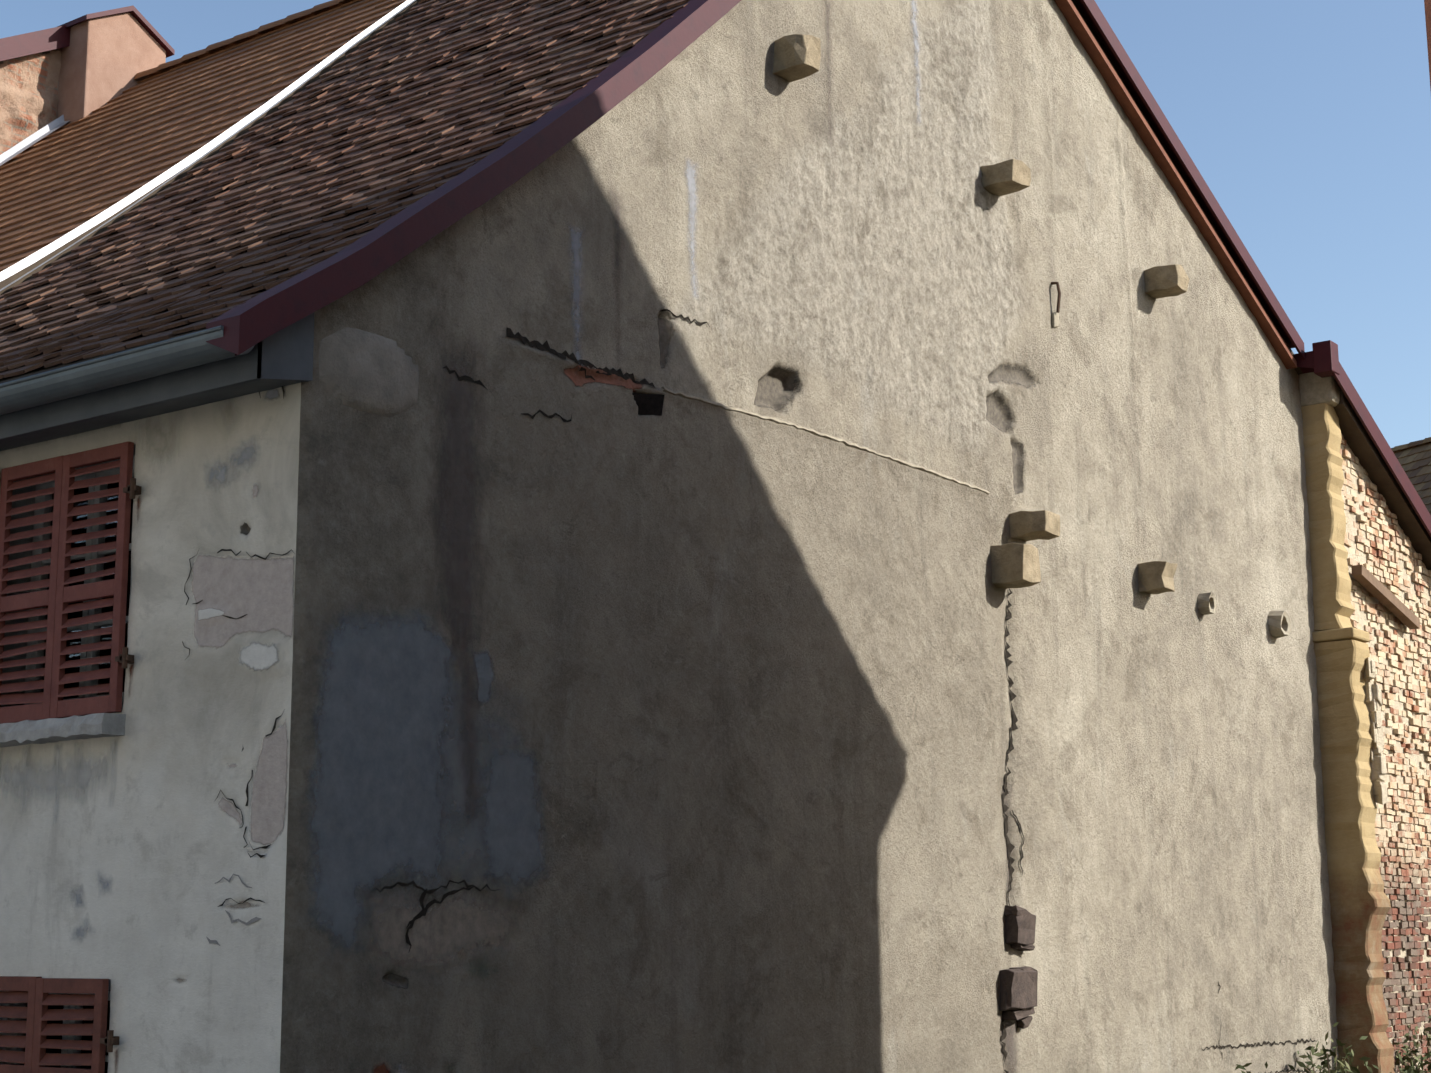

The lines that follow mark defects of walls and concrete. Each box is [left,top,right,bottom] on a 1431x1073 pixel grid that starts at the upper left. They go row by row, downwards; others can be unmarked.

crack [443,365,487,389]
crack [506,327,655,422]
flaking render [754,367,800,411]
peeling [182,549,295,671]
peeling [215,709,287,858]
crack [1002,589,1024,906]
crack [1001,1019,1009,1073]